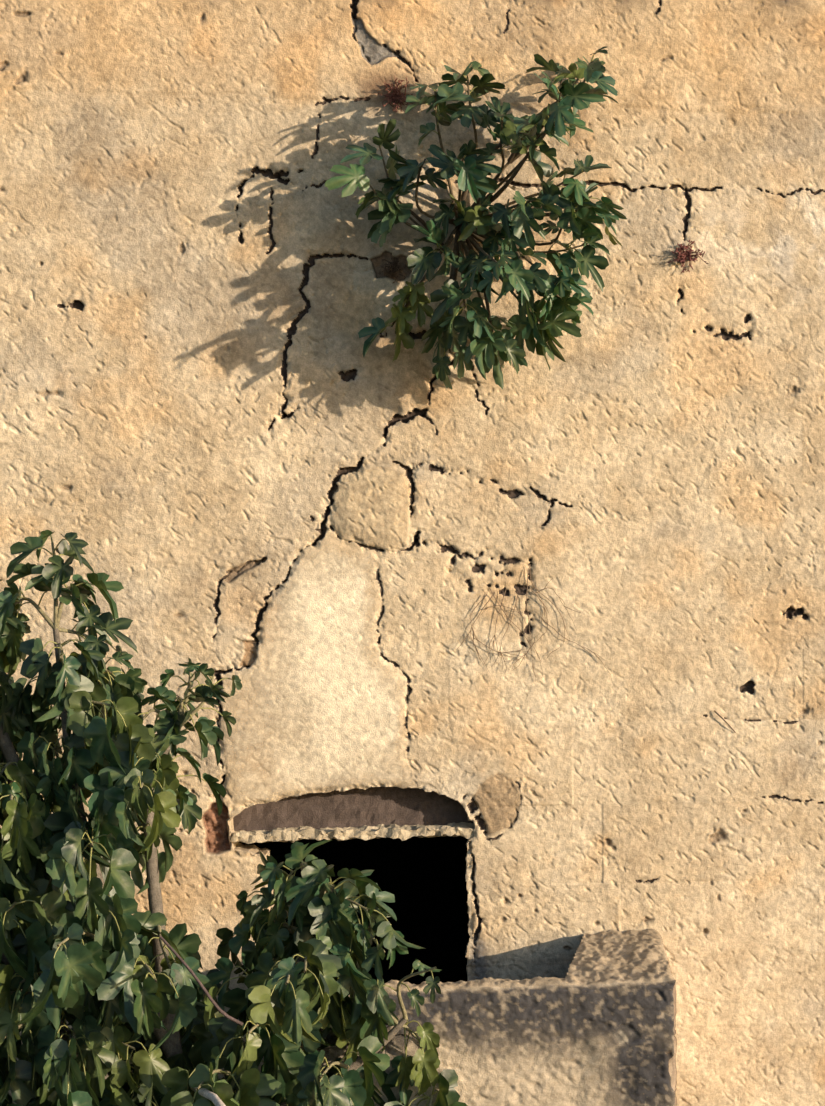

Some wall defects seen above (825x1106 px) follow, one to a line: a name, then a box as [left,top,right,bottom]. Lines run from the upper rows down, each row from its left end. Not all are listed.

spalling [352,18,399,65]
crack [350,0,418,82]
crack [502,0,510,34]
crack [235,96,371,254]
crack [497,178,722,240]
crack [756,188,825,198]
crack [268,253,368,430]
crack [529,486,572,526]
crack [212,359,501,796]